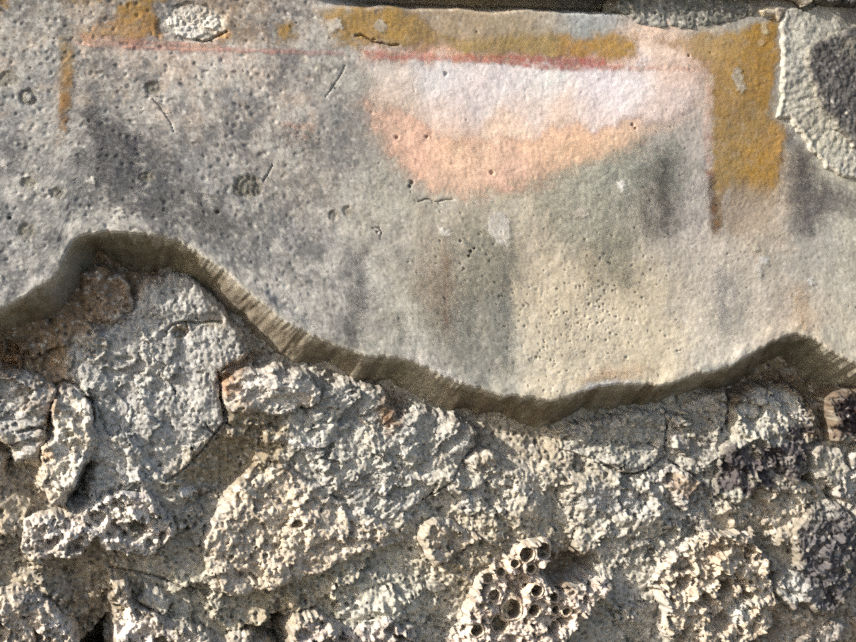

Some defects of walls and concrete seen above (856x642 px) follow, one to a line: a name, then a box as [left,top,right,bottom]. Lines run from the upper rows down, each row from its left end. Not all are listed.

flaking render [160,5,228,42]
damp [81,104,252,241]
damp [787,141,856,229]
spalling [0,231,856,429]
crack [166,372,230,482]
crack [605,418,690,477]